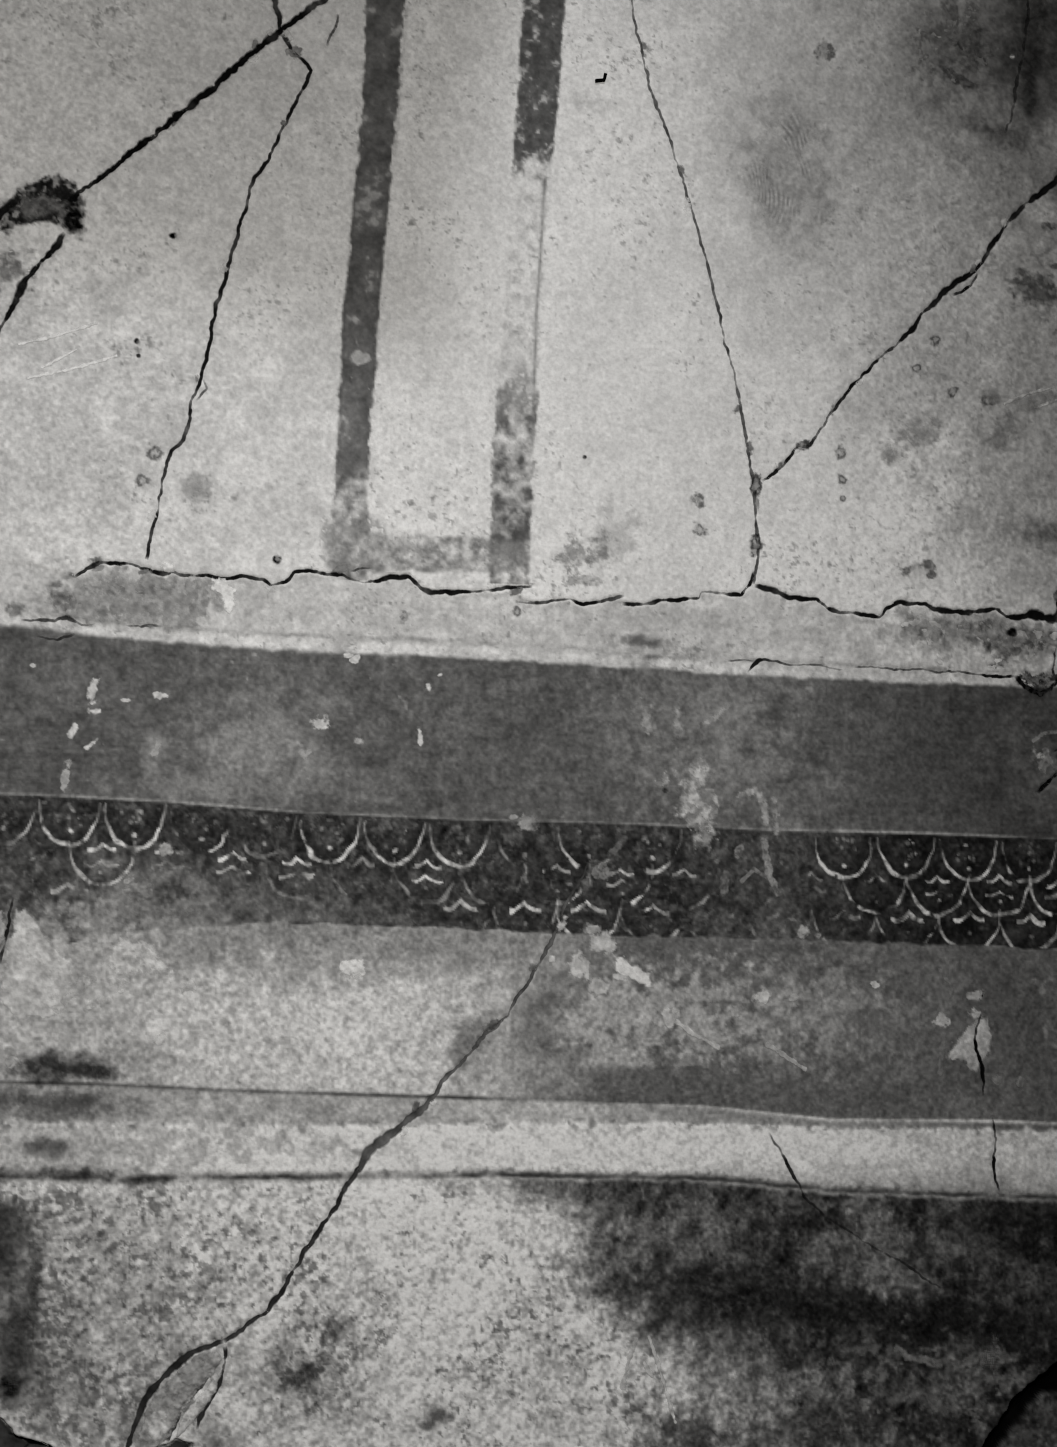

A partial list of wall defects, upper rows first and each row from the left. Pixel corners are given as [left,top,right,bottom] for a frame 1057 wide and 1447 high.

crack [0,200,15,220]
crack [0,234,64,331]
crack [72,0,1057,675]
crack [25,615,76,641]
crack [885,667,1012,678]
crack [1038,749,1057,792]
crack [974,994,999,1188]
crack [126,882,580,1447]
spalling [0,1399,64,1447]
peeling [130,1352,222,1447]
crack [982,1362,1057,1447]